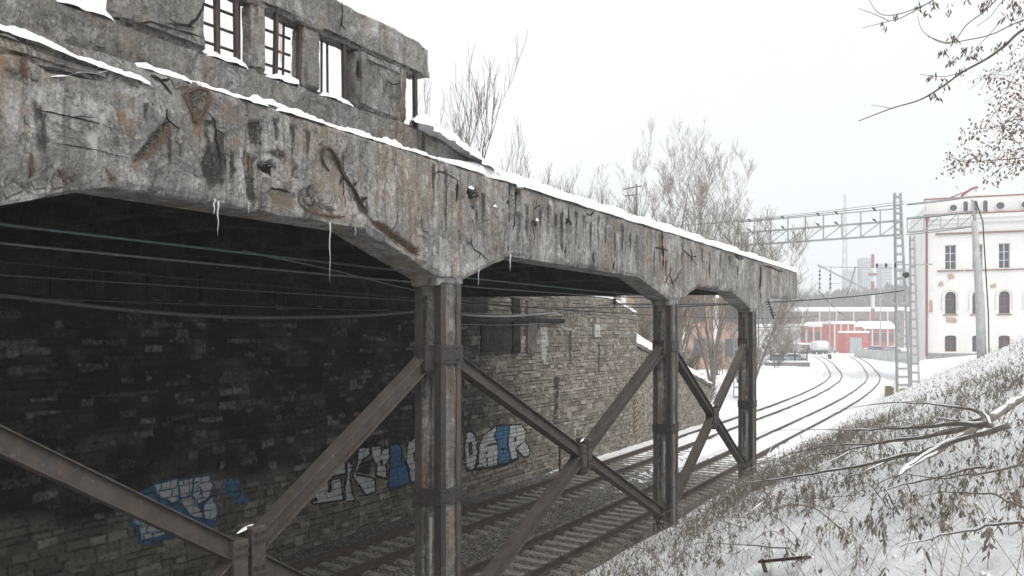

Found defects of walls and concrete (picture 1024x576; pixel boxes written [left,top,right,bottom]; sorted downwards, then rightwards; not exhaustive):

crack [34,108,131,159]
spalling [133,121,185,161]
water stain [203,132,235,188]
spalling [166,75,287,207]
spalling [298,189,345,218]
spalling [320,147,420,256]
crack [654,231,696,289]